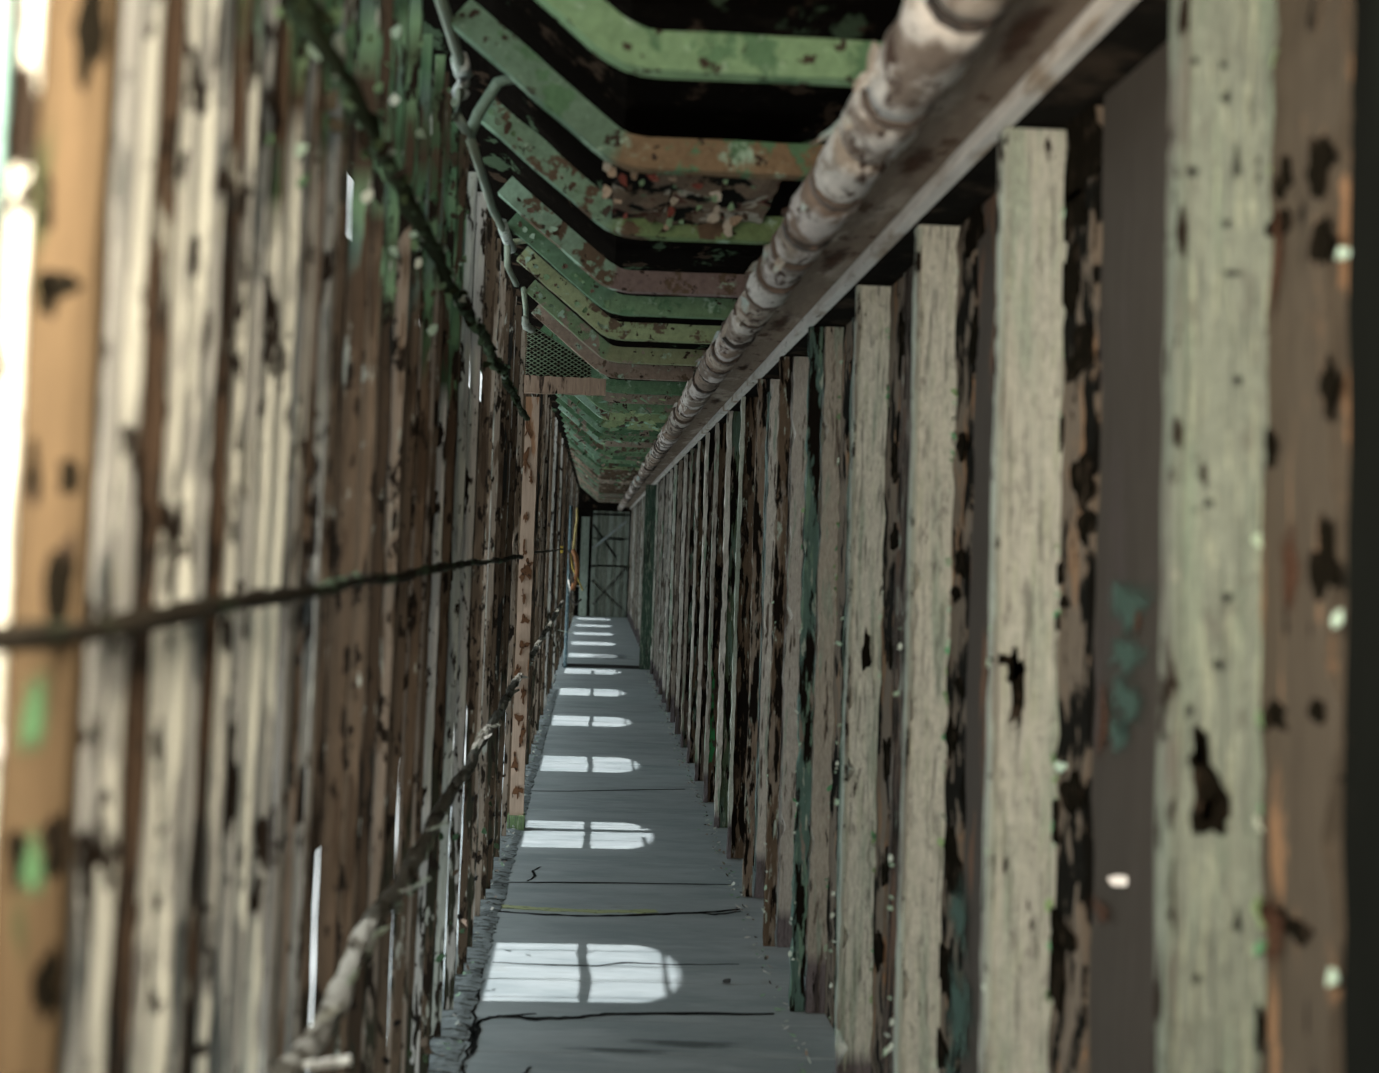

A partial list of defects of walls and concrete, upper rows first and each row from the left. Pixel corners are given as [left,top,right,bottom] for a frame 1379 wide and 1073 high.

peeling [557,161,781,237]
spalling [1060,103,1103,383]
spalling [1265,134,1350,267]
spalling [1058,411,1098,547]
spalling [1265,426,1279,468]
spalling [1052,535,1071,631]
spalling [1308,512,1340,601]
peeling [1331,610,1343,629]
spalling [1255,698,1289,732]
spalling [1051,752,1084,848]
crack [461,859,774,1073]
spalling [1044,898,1077,1015]